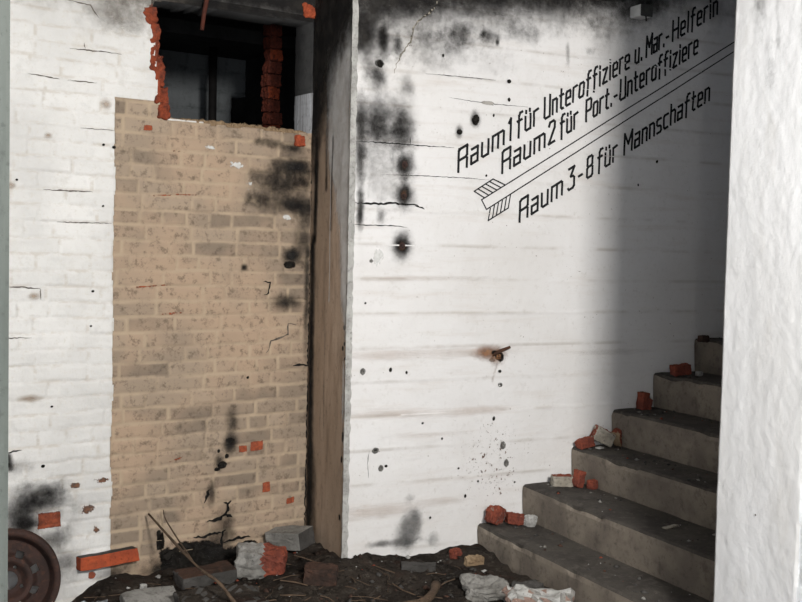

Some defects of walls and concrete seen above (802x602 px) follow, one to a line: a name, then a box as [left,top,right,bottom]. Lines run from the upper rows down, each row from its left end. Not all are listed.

leakage [380,27,400,50]
spalling [143,7,306,134]
leakage [357,144,365,176]
corrosion [479,348,502,361]
spalling [226,438,263,452]
spalling [37,511,61,529]
crack [194,490,250,547]
leakage [377,511,420,546]